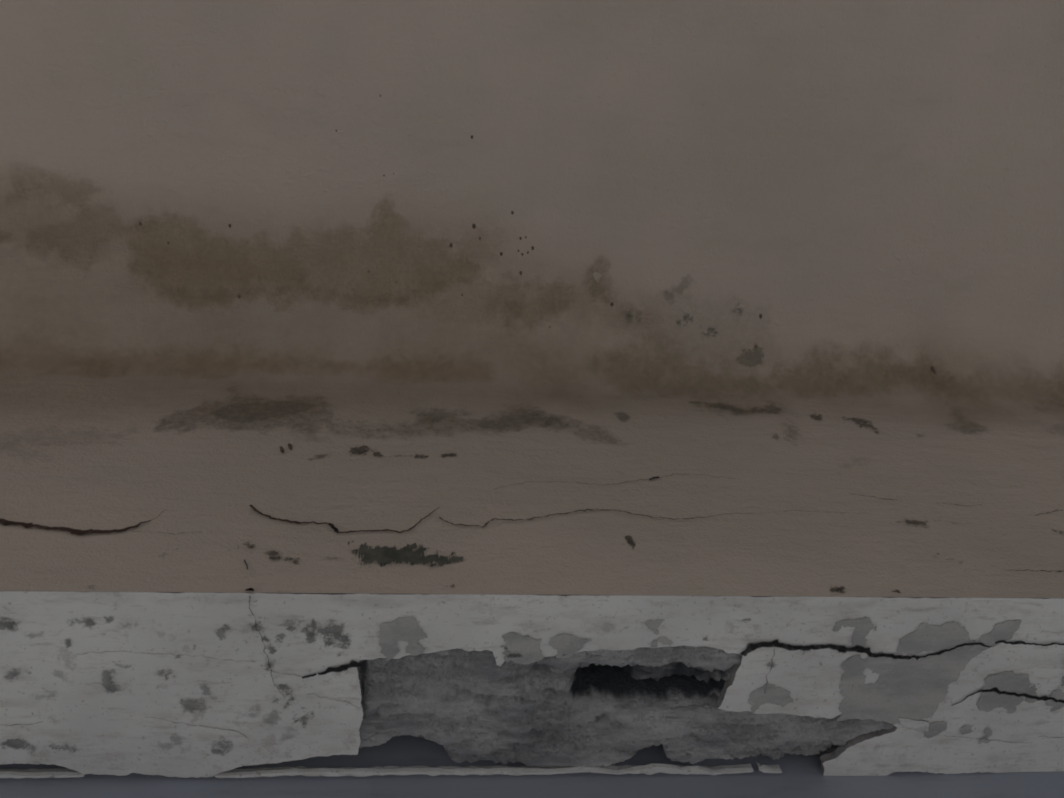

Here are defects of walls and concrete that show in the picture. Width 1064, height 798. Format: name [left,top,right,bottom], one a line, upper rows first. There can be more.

water stain [349,445,383,456]
crack [0,509,202,535]
crack [249,473,749,533]
crack [740,640,1064,694]
spalling [359,617,1021,767]
crack [952,688,1064,706]
peeling [977,671,1064,714]